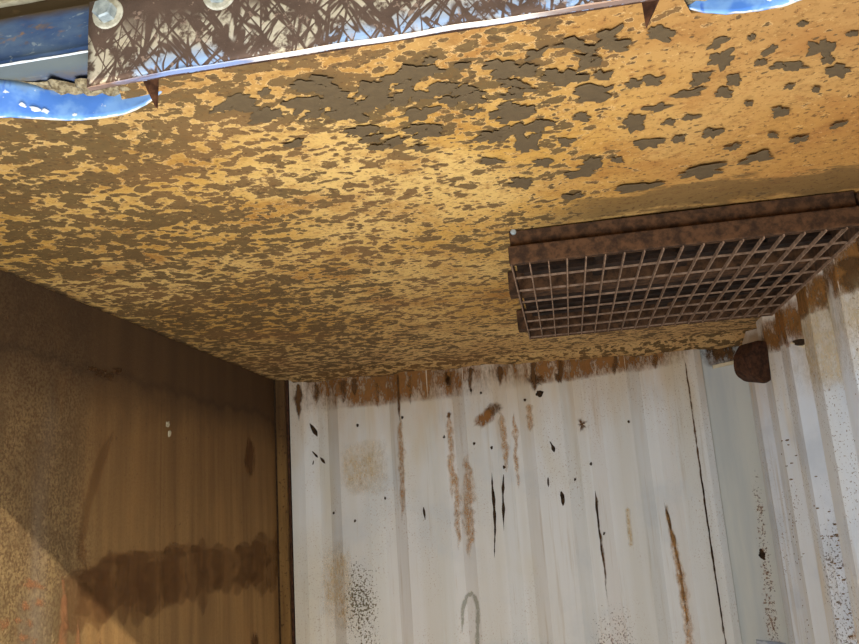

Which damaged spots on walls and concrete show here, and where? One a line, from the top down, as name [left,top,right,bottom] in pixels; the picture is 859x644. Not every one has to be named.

peeling [646,25,677,43]
peeling [754,39,852,79]
peeling [209,24,666,168]
peeling [622,37,742,150]
peeling [507,177,533,190]
peeling [563,157,625,179]
peeling [678,150,774,180]
rust [763,236,859,350]
rust [294,366,480,417]
rust [497,352,667,397]
rust [706,347,735,365]
rust [665,507,688,623]